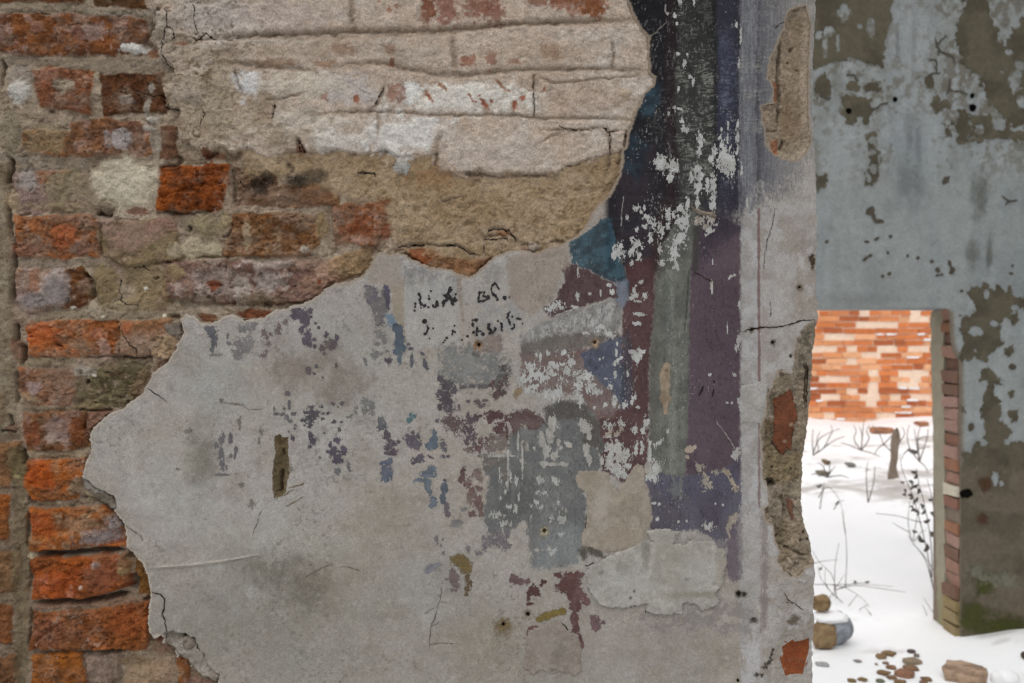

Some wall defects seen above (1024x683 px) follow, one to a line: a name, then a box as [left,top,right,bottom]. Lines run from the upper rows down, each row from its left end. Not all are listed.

crack [131,1,239,133]
flaking render [0,0,669,683]
crack [559,125,614,150]
crack [740,301,813,333]
peeling [815,173,829,193]
flaking render [761,0,894,186]
peeling [866,206,884,223]
peeling [906,254,955,277]
peeling [924,0,1024,145]
flaking render [760,320,817,577]
peeling [958,264,1024,637]
flaking render [780,638,810,676]